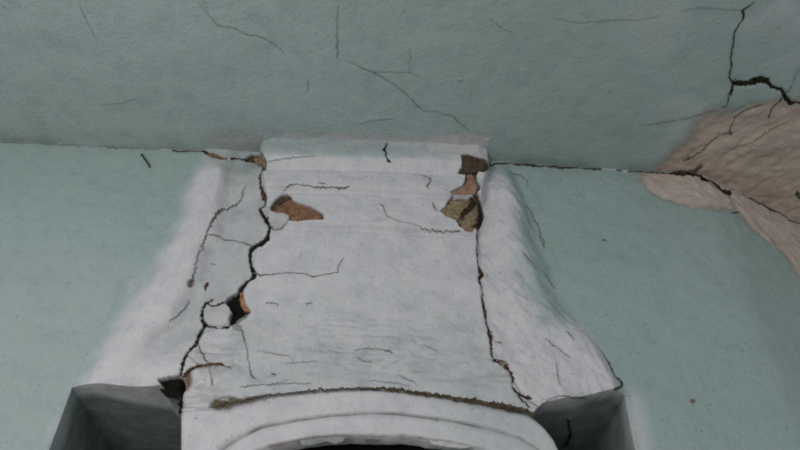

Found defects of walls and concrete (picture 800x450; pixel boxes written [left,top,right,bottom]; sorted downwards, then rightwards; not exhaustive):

crack [2,141,202,152]
crack [489,1,800,288]
spalling [271,196,323,221]
spalling [442,155,488,232]
crack [170,156,588,417]
spalling [227,292,251,331]
spalling [159,379,186,400]
crack [601,351,623,391]